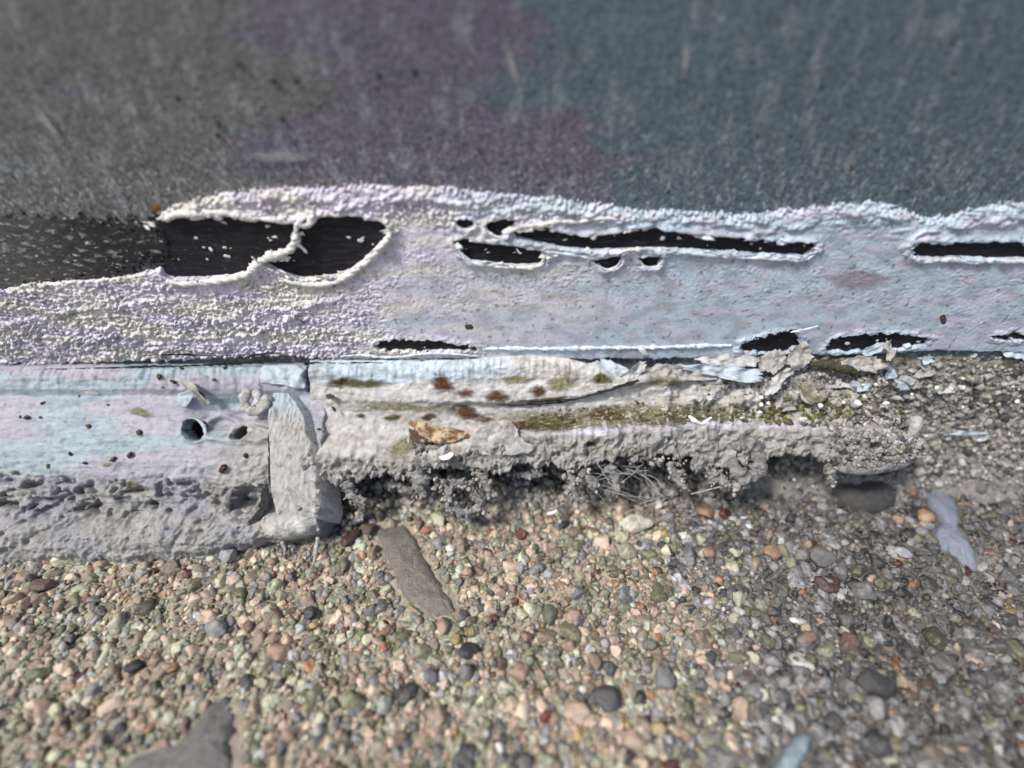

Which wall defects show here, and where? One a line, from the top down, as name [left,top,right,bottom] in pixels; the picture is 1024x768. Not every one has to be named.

peeling [0,208,401,290]
peeling [454,217,826,273]
peeling [903,230,1024,265]
peeling [377,339,477,351]
peeling [589,330,814,395]
peeling [407,420,469,460]